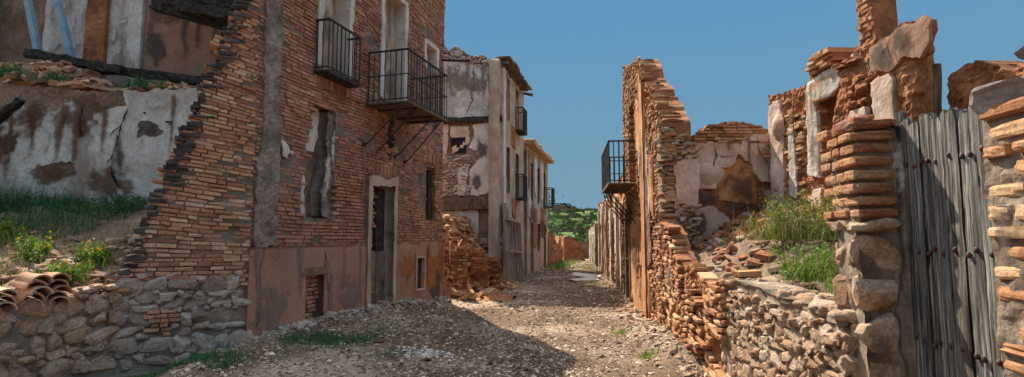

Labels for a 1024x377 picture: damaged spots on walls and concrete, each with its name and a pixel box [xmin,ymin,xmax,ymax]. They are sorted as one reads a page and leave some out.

peeling [0,83,126,122]
crack [107,105,130,186]
spalling [138,112,173,138]
peeling [450,126,470,154]
peeling [45,161,77,180]
peeling [457,166,469,196]
peeling [694,133,771,238]